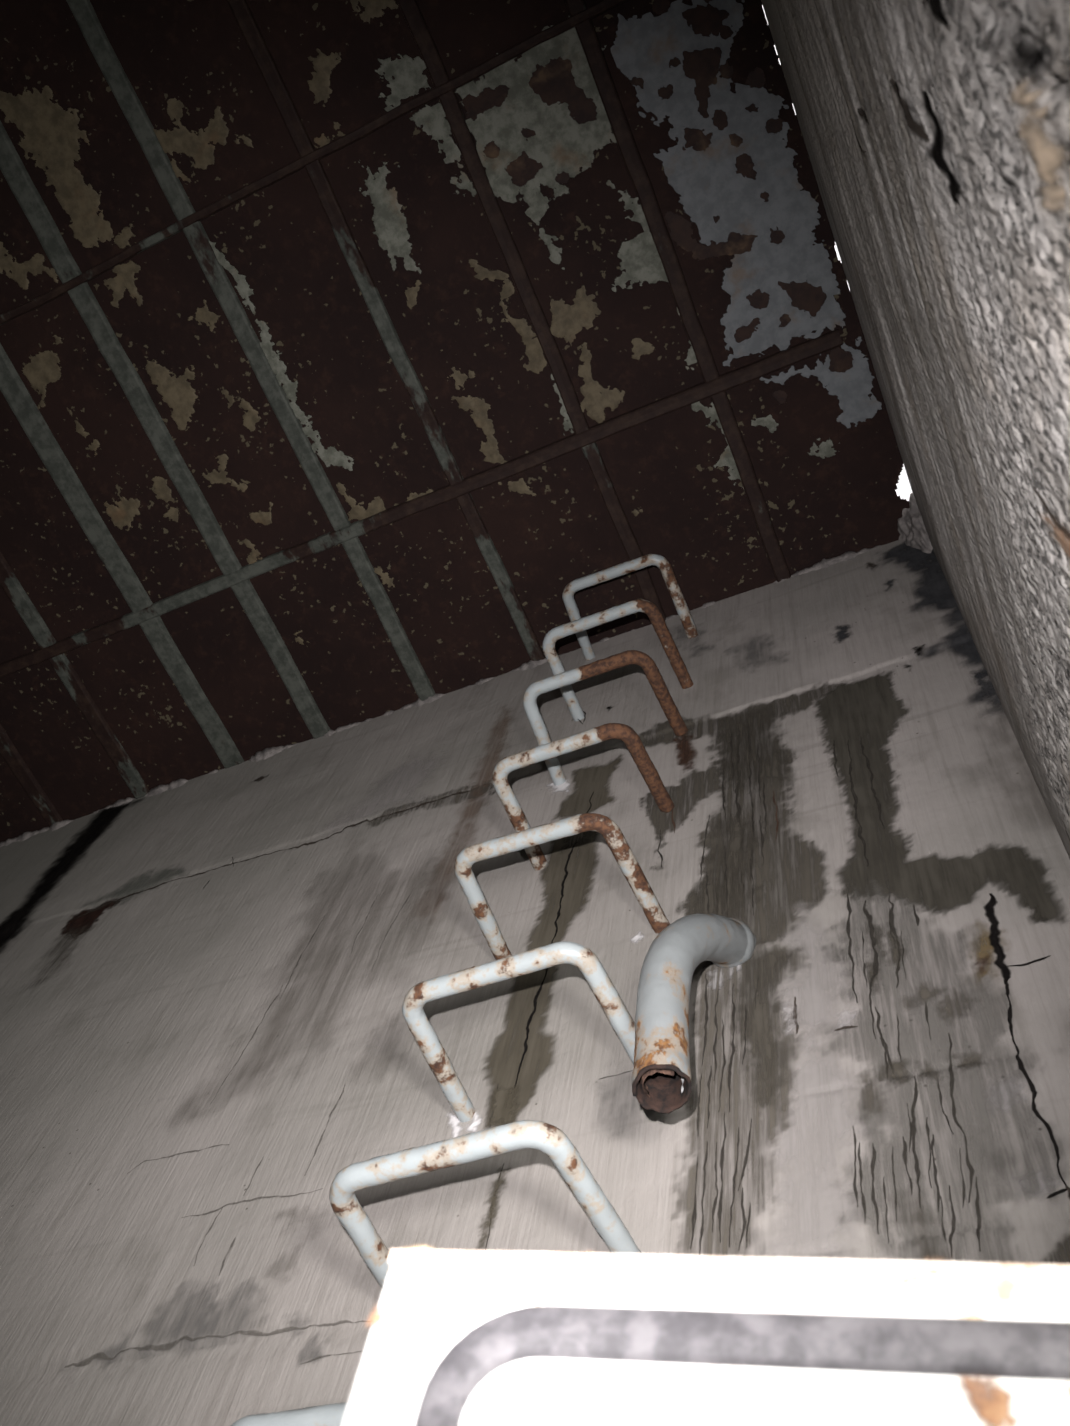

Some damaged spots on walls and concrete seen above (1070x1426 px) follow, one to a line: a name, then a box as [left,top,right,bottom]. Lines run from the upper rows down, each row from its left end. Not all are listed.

peeling [0,85,143,308]
peeling [145,359,199,430]
peeling [153,98,254,185]
peeling [202,241,386,521]
peeling [358,162,422,310]
peeling [447,367,510,464]
peeling [375,16,617,270]
peeling [469,259,625,436]
peeling [602,0,882,459]
damp [639,542,1064,1263]
crack [984,893,1070,1199]
rust [962,1375,1017,1426]